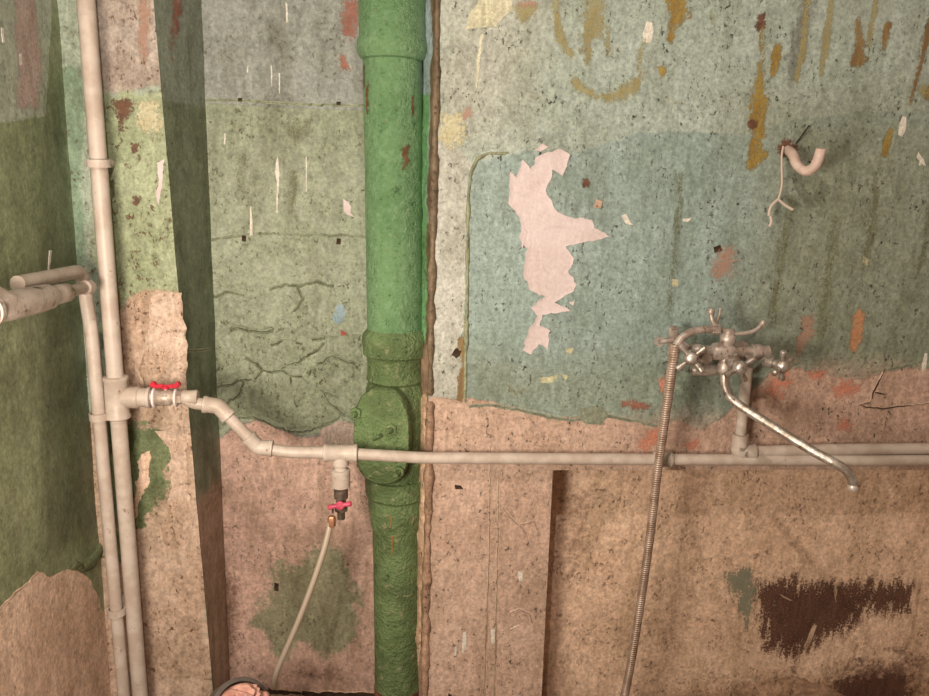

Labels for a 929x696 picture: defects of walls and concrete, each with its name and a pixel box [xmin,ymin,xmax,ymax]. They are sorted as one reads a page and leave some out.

peeling [508,144,610,354]
crack [213,290,244,298]
crack [269,279,334,333]
peeling [540,374,569,383]
peeling [469,403,657,427]
peeling [134,451,151,518]
peeling [155,428,194,568]
peeling [0,543,111,696]
leakage [754,574,916,679]
flaking render [736,678,844,696]
leakage [818,650,917,696]